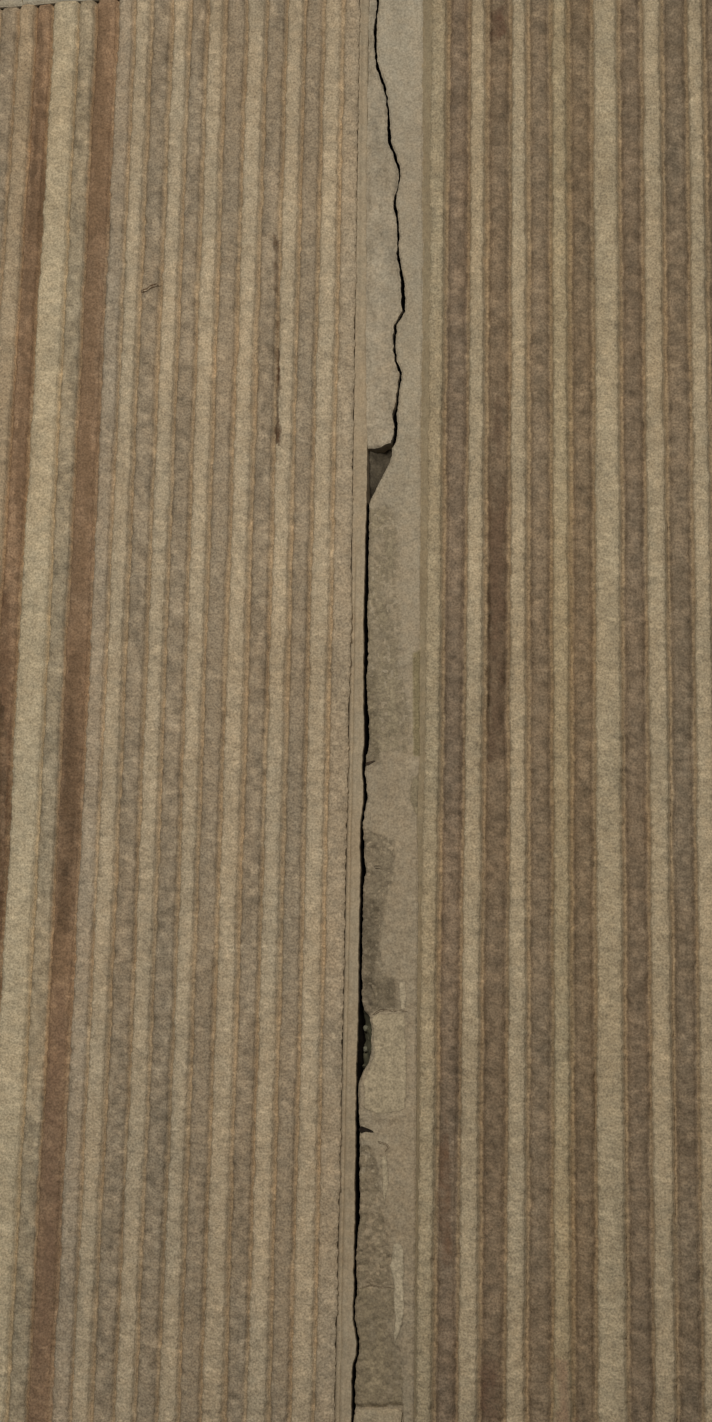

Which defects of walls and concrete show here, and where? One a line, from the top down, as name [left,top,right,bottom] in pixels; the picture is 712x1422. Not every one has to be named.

crack [374,0,406,445]
crack [352,503,407,1422]